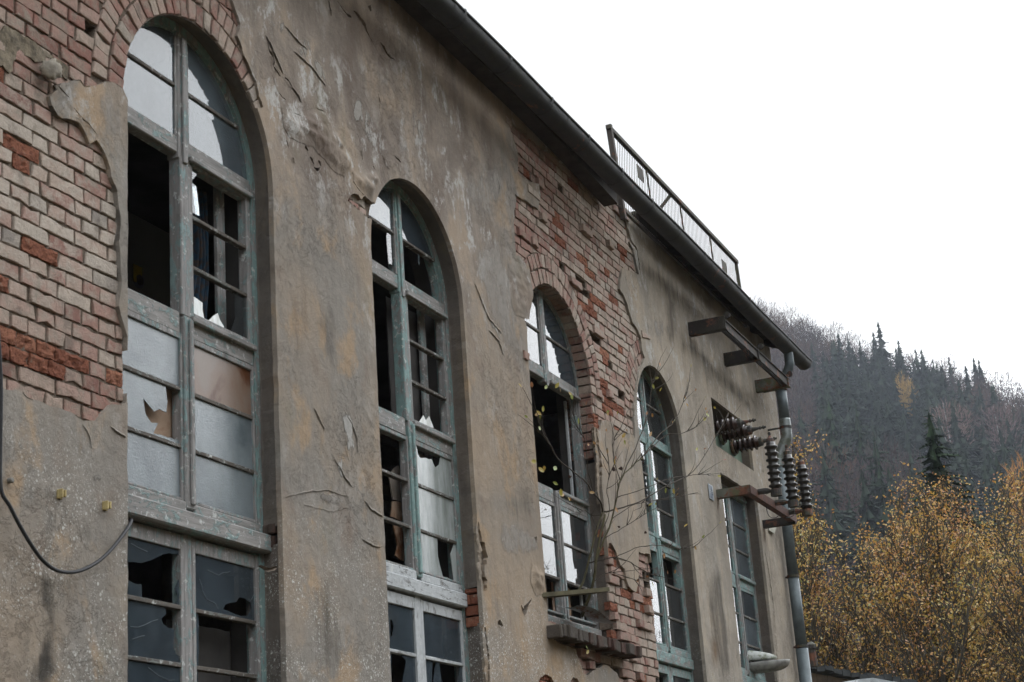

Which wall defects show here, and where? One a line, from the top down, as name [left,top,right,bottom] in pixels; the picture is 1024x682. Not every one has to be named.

flaking render [0,0,263,448]
flaking render [505,115,651,435]
flaking render [555,529,659,682]